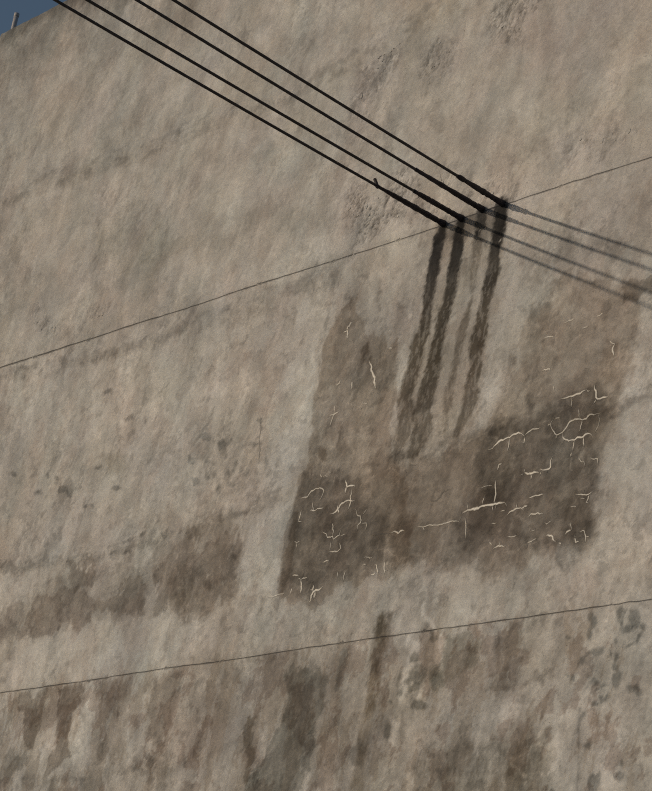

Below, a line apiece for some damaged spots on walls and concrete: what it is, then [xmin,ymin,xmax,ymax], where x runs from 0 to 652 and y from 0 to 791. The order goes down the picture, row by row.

crack [269,472,387,603]
damp [269,192,652,617]
crack [391,368,608,549]